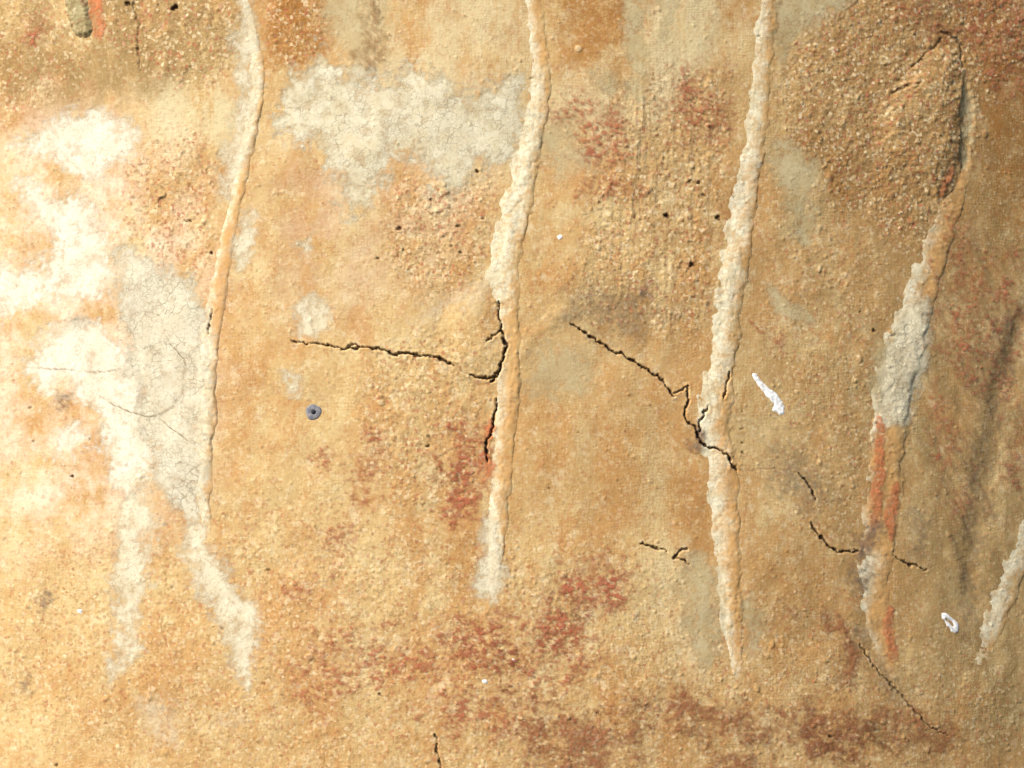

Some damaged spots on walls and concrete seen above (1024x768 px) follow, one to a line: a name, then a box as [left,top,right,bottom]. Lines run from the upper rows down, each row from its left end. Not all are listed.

crack [296,342,452,365]
crack [475,303,508,461]
crack [579,329,737,471]
crack [811,524,855,553]
rust [870,416,900,541]